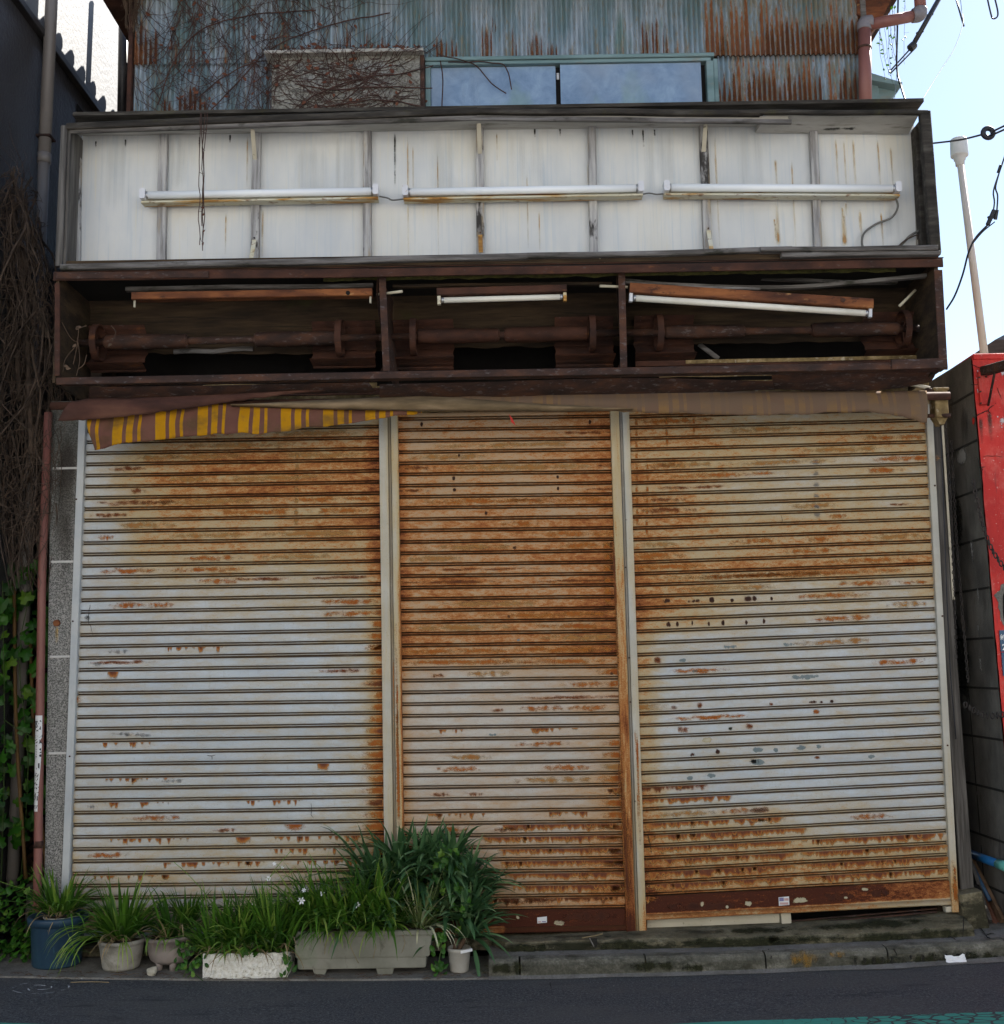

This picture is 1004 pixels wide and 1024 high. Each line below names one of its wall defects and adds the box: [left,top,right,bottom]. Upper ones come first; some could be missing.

rust [766,18,858,54]
rust [719,68,822,101]
rust [839,71,857,99]
rust [426,441,612,470]
rust [162,452,370,537]
rust [399,488,612,505]
rust [635,418,911,599]
rust [794,435,939,519]
rust [274,521,619,866]
rust [672,703,753,732]
rust [482,738,958,907]
rust [127,861,264,881]